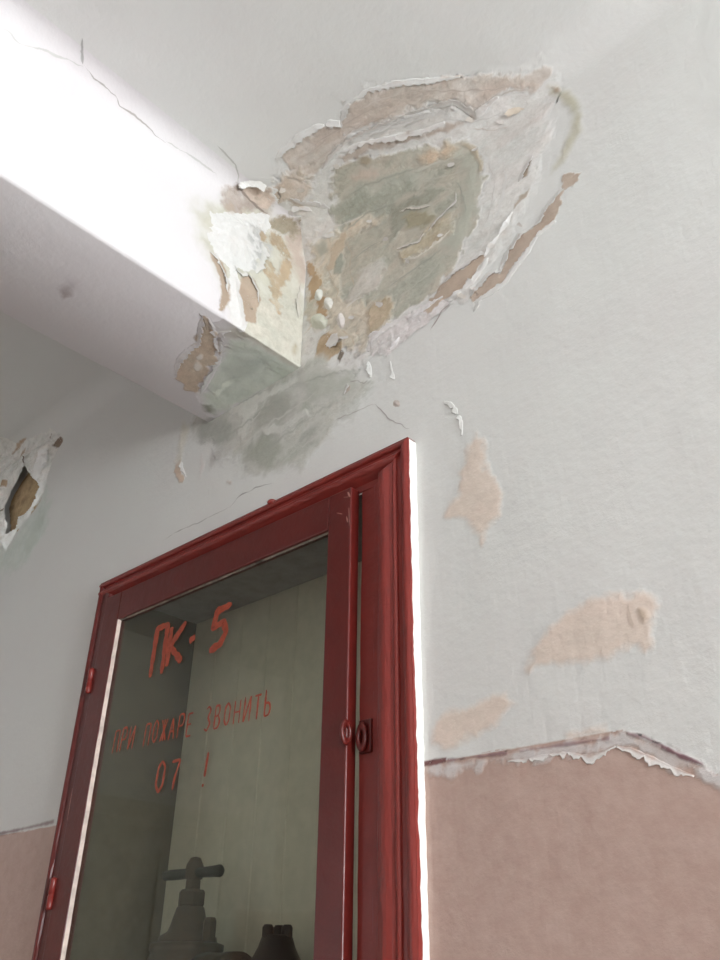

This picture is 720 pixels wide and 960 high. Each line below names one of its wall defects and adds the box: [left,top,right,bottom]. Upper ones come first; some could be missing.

crack [2,28,239,186]
peeling [233,49,583,380]
flaking render [0,428,64,552]
spalling [173,314,231,394]
water stain [186,335,381,487]
peeling [441,401,507,551]
peeling [521,586,665,679]
peeling [424,685,720,795]